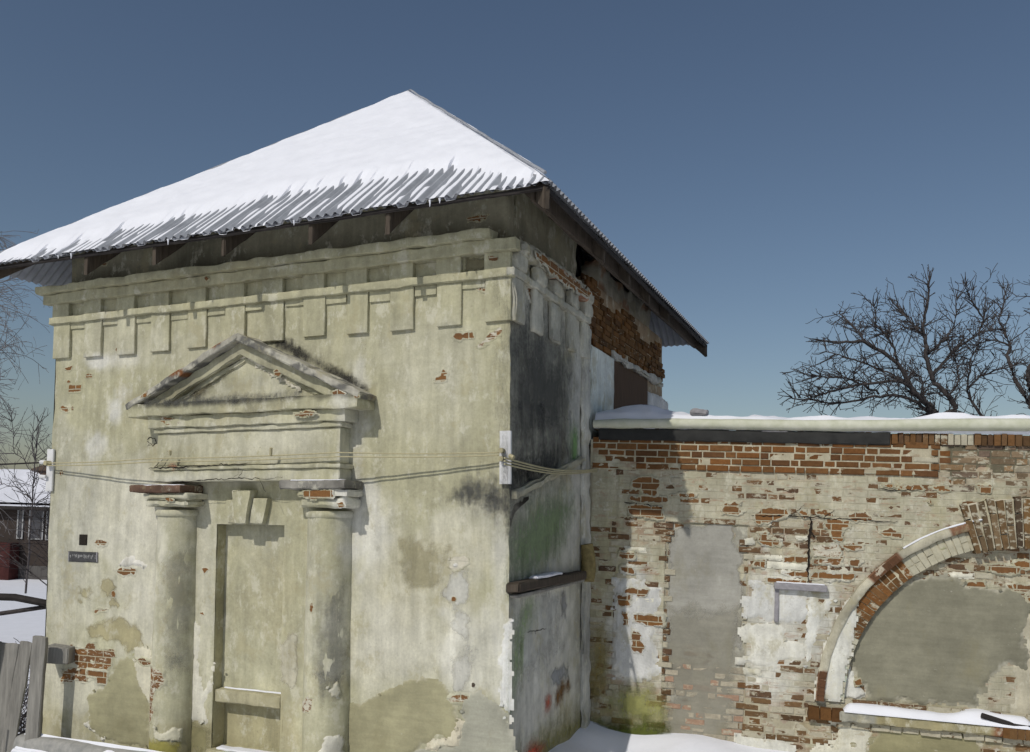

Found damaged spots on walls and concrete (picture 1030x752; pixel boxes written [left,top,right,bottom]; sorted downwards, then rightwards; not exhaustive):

flaking render [60,555,216,749]
peeling [611,550,668,683]
peeling [720,500,905,702]
crack [752,505,897,582]
flaking render [881,481,994,517]
peeling [951,558,1030,715]
peeling [734,733,796,752]
spalling [810,721,1030,752]